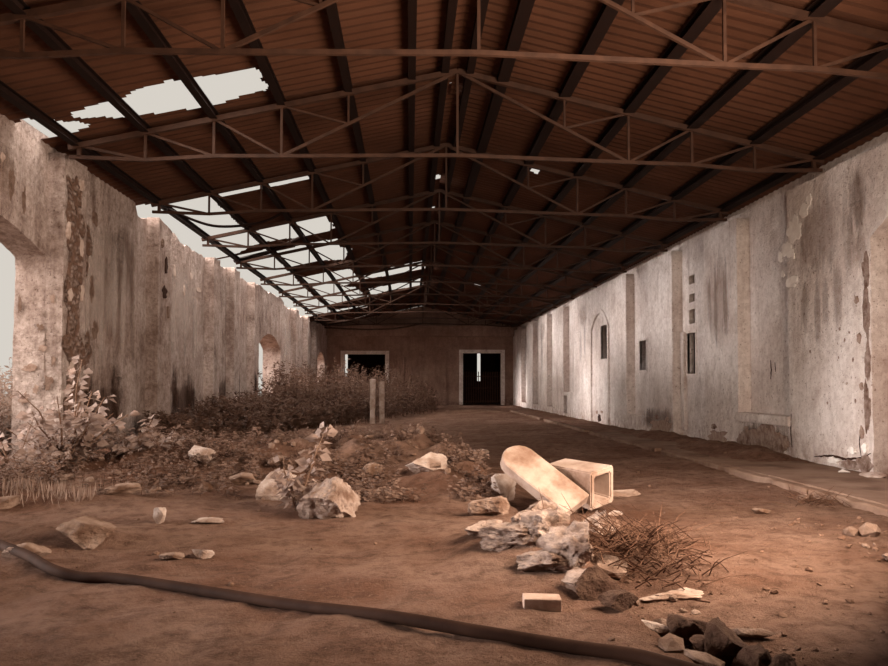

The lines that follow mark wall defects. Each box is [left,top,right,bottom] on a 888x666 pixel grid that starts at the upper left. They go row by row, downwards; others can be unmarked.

spalling [828,251,874,472]